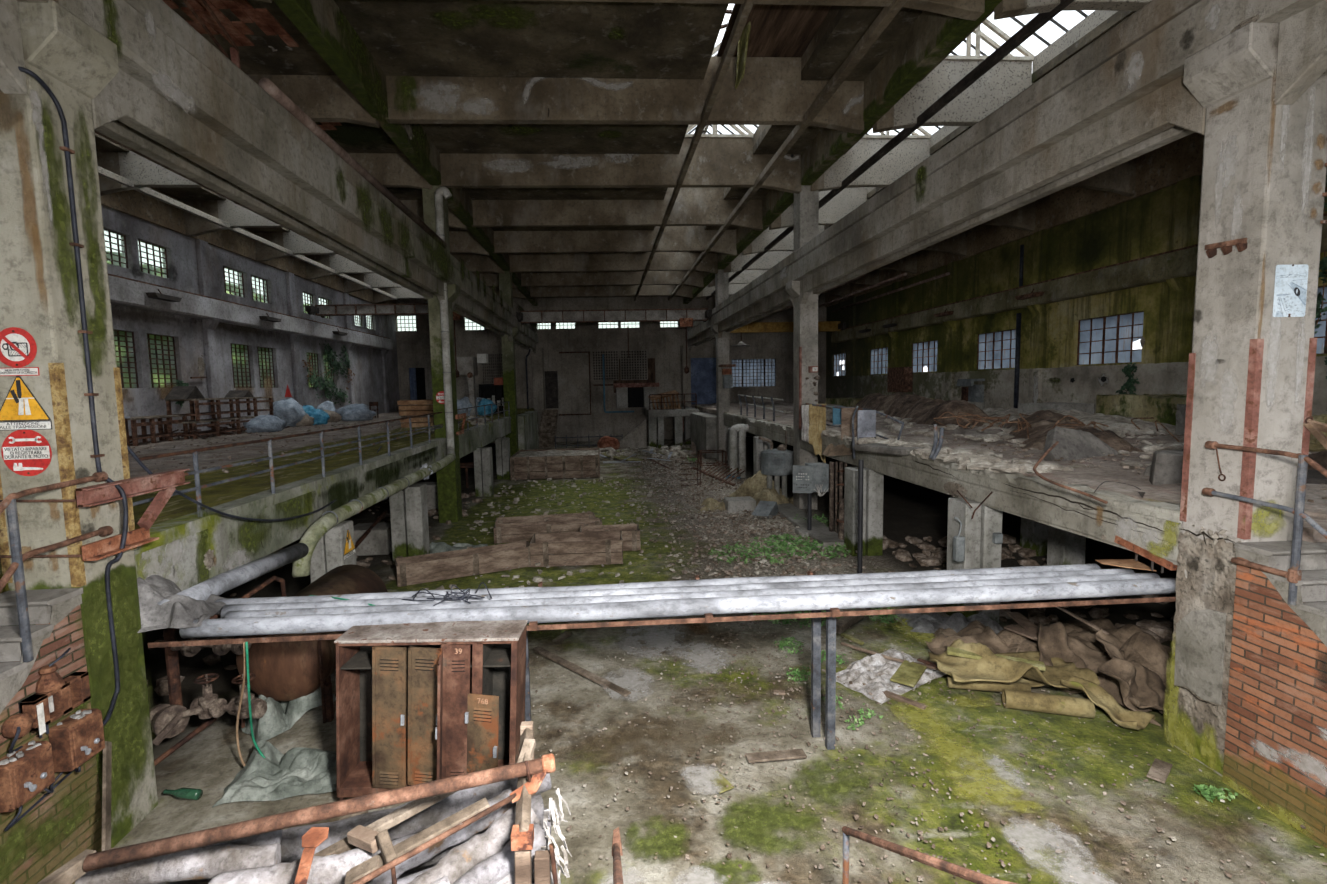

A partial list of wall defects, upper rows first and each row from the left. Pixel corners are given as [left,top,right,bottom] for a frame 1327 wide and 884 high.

water stain [1181,31,1194,49]
water stain [1115,54,1143,85]
water stain [31,90,175,375]
water stain [217,322,265,335]